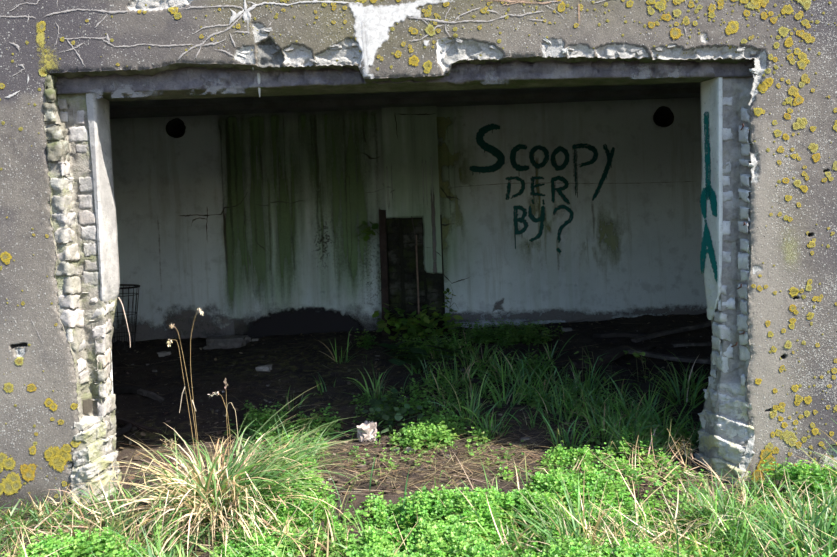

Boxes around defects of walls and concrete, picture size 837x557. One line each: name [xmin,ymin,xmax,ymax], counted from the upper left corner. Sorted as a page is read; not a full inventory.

spalling [127,0,193,11]
crack [5,42,29,98]
crack [0,0,362,65]
spalling [234,23,361,68]
spalling [439,38,503,73]
damp [220,113,378,306]
spalling [82,398,93,414]
spalling [734,435,755,486]